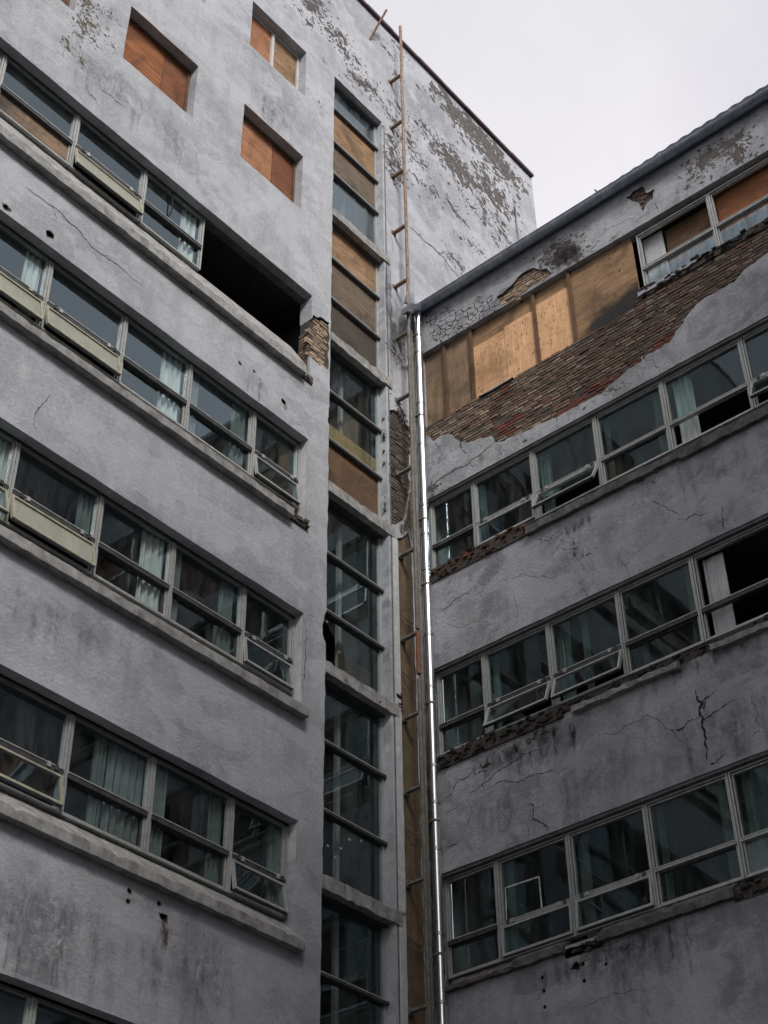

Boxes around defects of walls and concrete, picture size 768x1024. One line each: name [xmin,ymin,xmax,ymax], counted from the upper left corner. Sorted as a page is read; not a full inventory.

peeling [60,0,120,69]
peeling [285,0,530,275]
peeling [676,114,764,198]
crack [26,187,147,289]
flaking render [627,188,653,210]
flaking render [298,317,328,370]
peeling [385,330,408,372]
crack [425,295,499,344]
flaking render [426,220,768,449]
flaking render [382,393,410,524]
crack [599,687,763,765]
crack [443,749,567,847]